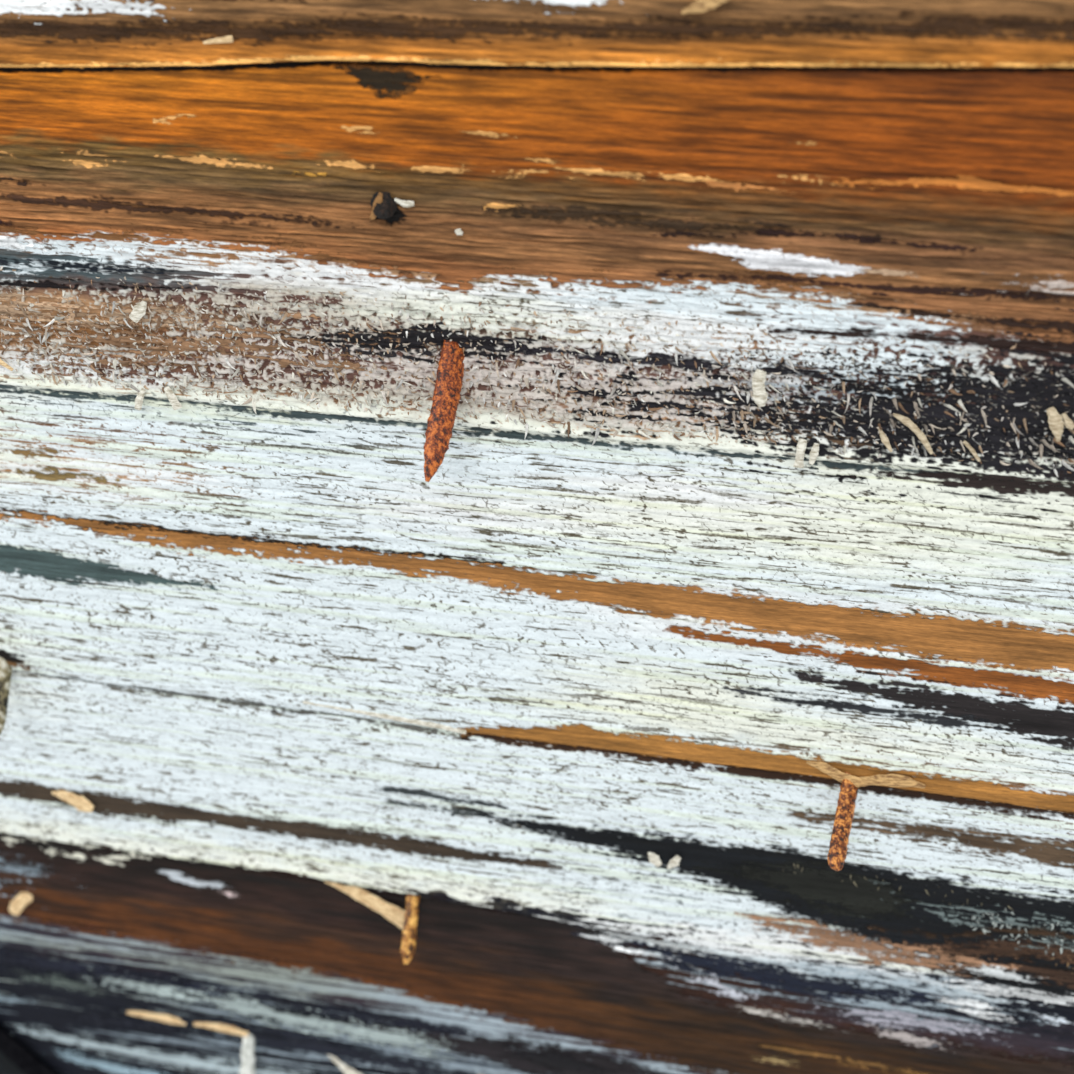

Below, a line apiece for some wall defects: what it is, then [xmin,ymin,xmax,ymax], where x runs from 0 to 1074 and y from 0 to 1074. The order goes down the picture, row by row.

peeling [0,0,1074,504]
peeling [0,510,1074,750]
peeling [0,781,562,870]
peeling [0,804,1074,1074]
peeling [457,723,1074,820]